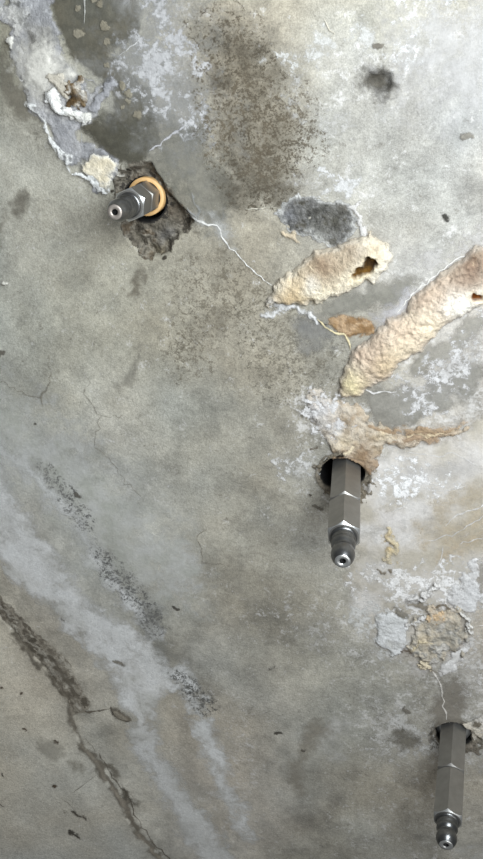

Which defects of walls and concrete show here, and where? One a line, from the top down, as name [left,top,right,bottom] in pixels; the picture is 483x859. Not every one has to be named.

water stain [0,0,374,222]
crack [175,199,271,285]
water stain [260,303,331,355]
water stain [325,277,427,323]
crack [0,596,170,859]
water stain [0,404,256,859]